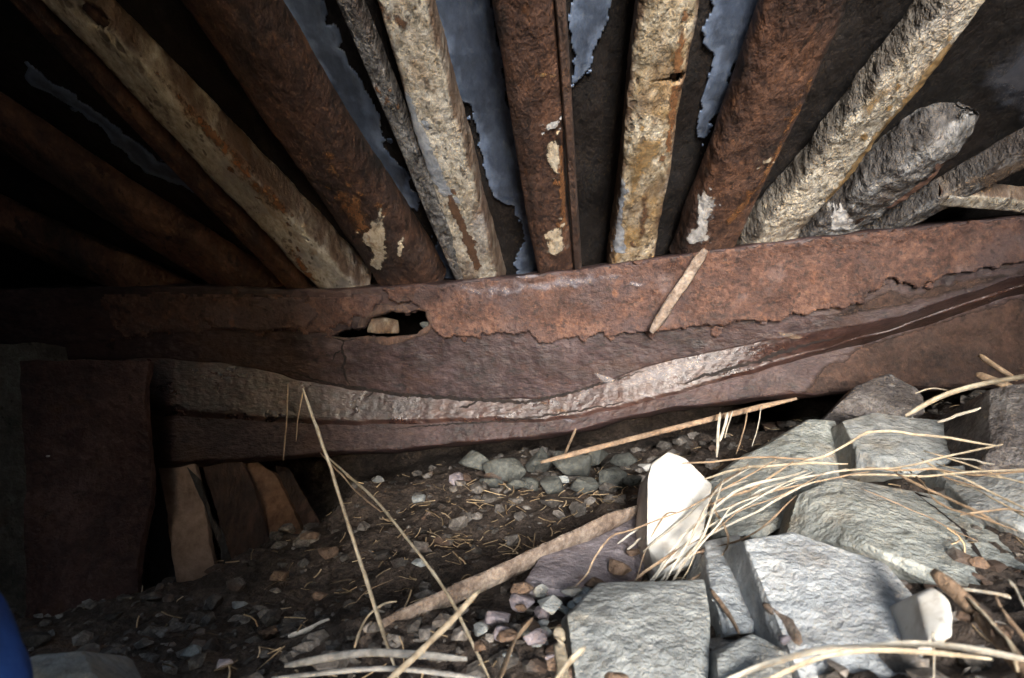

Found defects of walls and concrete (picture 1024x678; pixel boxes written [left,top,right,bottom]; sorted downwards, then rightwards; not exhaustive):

corrosion [169,86,294,226]
corrosion [324,151,383,235]
corrosion [553,145,568,241]
corrosion [628,10,690,247]
corrosion [727,104,802,224]
corrosion [383,189,1024,343]